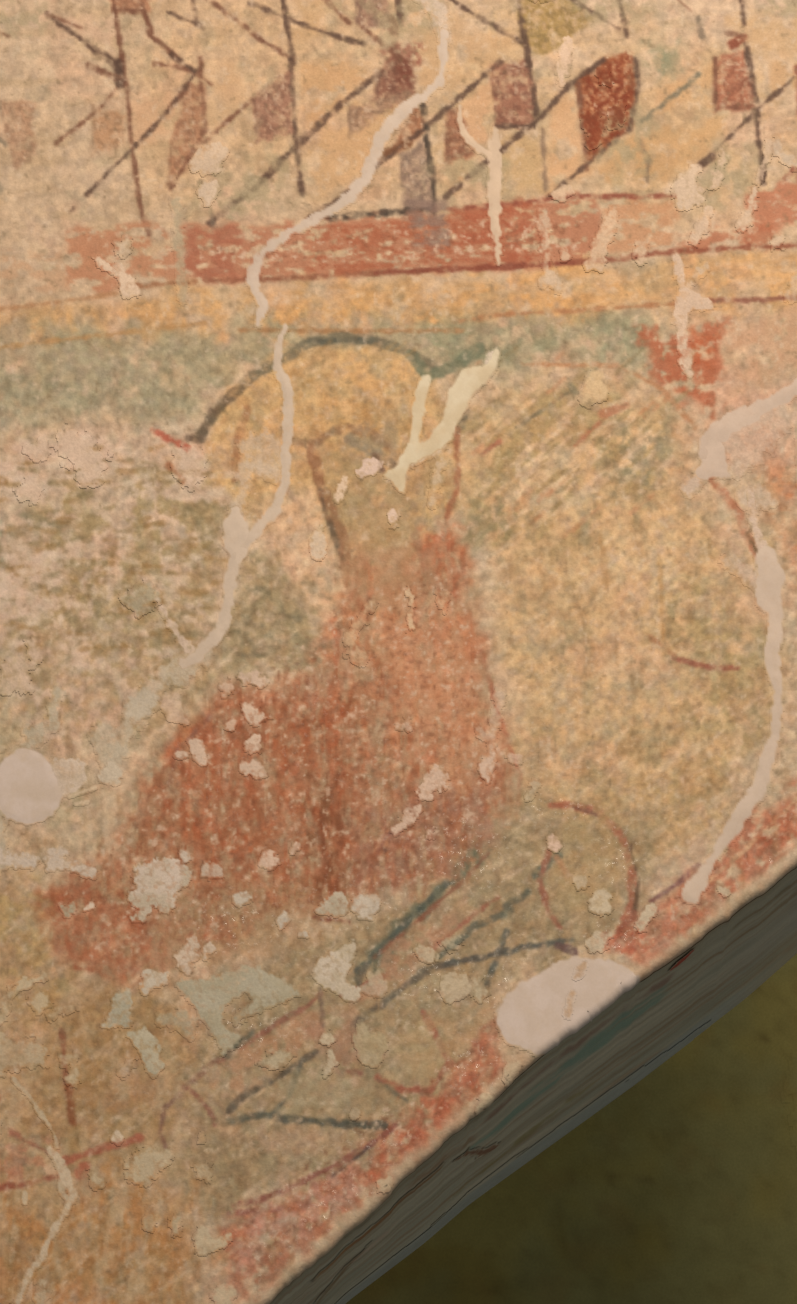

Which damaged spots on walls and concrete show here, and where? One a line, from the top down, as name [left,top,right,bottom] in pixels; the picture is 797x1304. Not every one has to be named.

crack [554,35,574,87]
crack [535,206,563,295]
crack [670,252,715,379]
crack [99,0,506,788]
crack [679,376,797,906]
peeling [390,762,451,840]
flaking render [126,845,225,924]
peeling [257,840,302,871]
flaking render [314,890,382,921]
flaking render [100,932,302,1080]
flaking render [310,937,389,1079]
flaking render [412,929,492,1005]